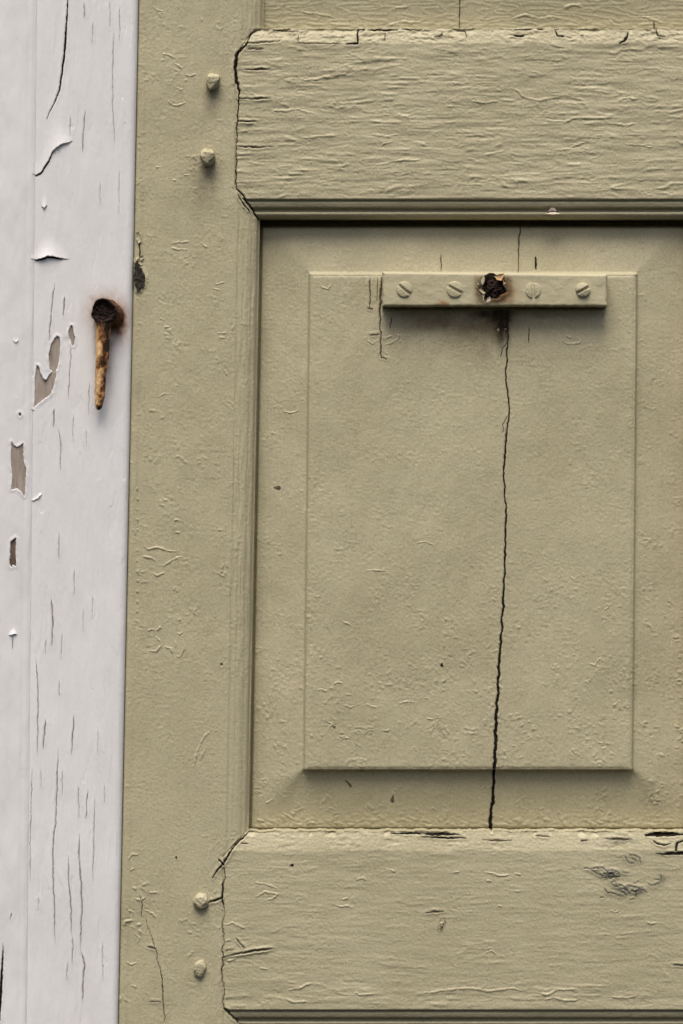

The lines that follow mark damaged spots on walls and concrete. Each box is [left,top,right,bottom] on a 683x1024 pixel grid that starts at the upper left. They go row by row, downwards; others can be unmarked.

crack [47,0,120,149]
crack [234,0,467,221]
peeling [32,117,73,176]
peeling [31,231,69,261]
spalling [133,232,149,295]
corrosion [478,277,511,338]
peeling [15,322,79,420]
peeling [7,438,42,501]
peeling [6,534,20,571]
crack [391,314,530,841]
crack [581,832,683,855]
crack [208,832,272,1023]